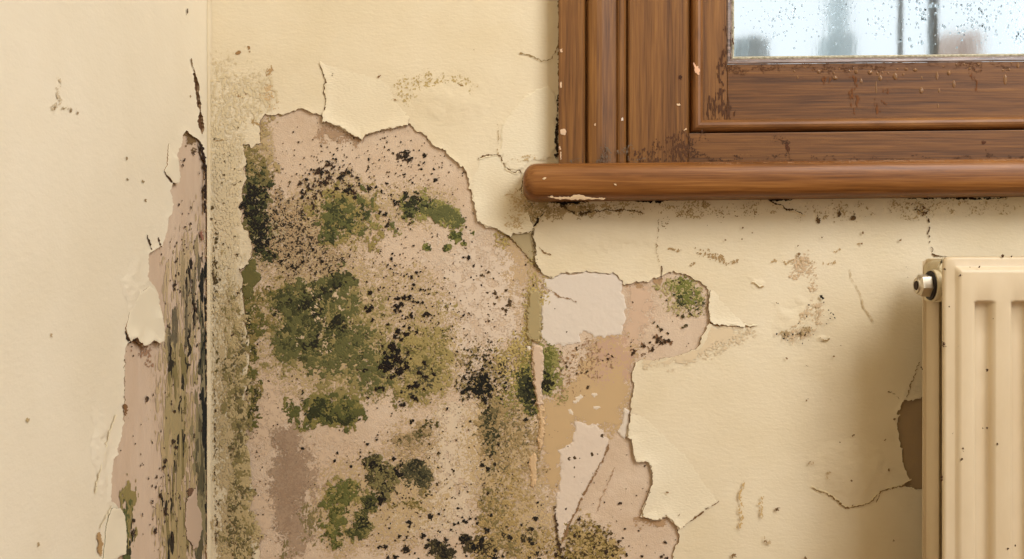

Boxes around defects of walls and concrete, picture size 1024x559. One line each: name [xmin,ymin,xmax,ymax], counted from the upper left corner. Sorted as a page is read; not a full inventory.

crack [191,58,228,213]
crack [520,5,558,158]
water stain [523,200,873,229]
water stain [888,197,1021,220]
flaking render [103,134,206,559]
water stain [119,50,756,559]
flaking render [239,62,745,559]
mould [776,304,814,344]
flaking render [897,397,922,489]